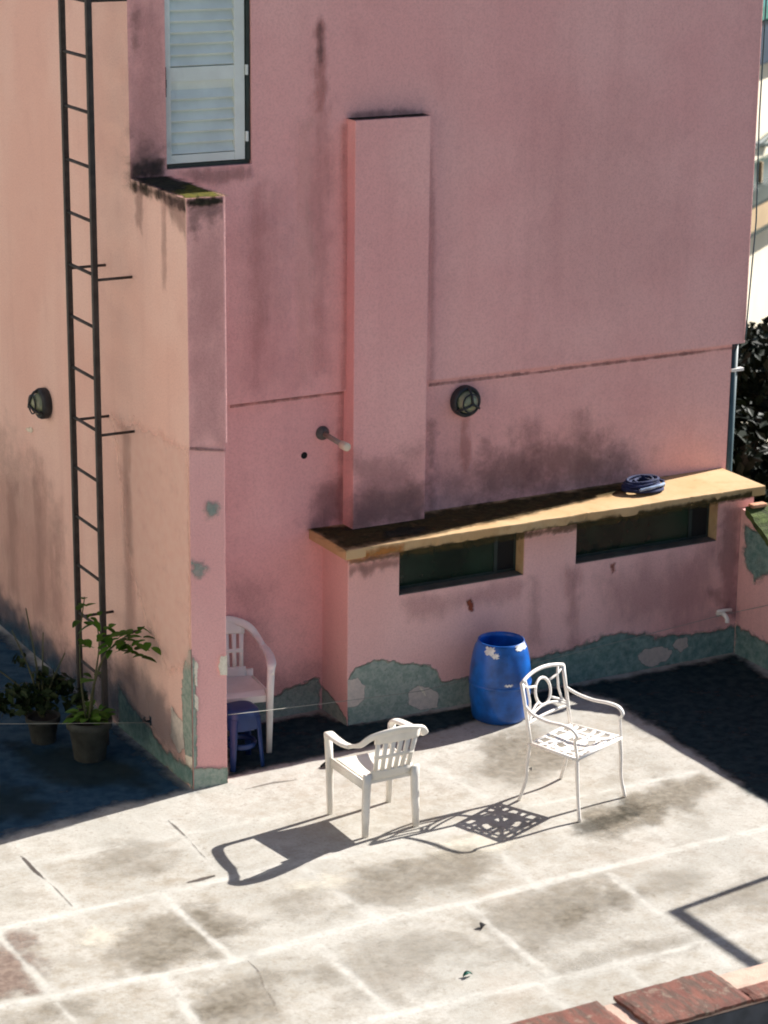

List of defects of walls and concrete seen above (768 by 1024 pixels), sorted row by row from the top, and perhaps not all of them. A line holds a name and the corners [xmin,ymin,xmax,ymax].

damp [132,159,223,212]
flaking render [530,625,768,691]
flaking render [170,649,228,790]
flaking render [322,659,471,726]